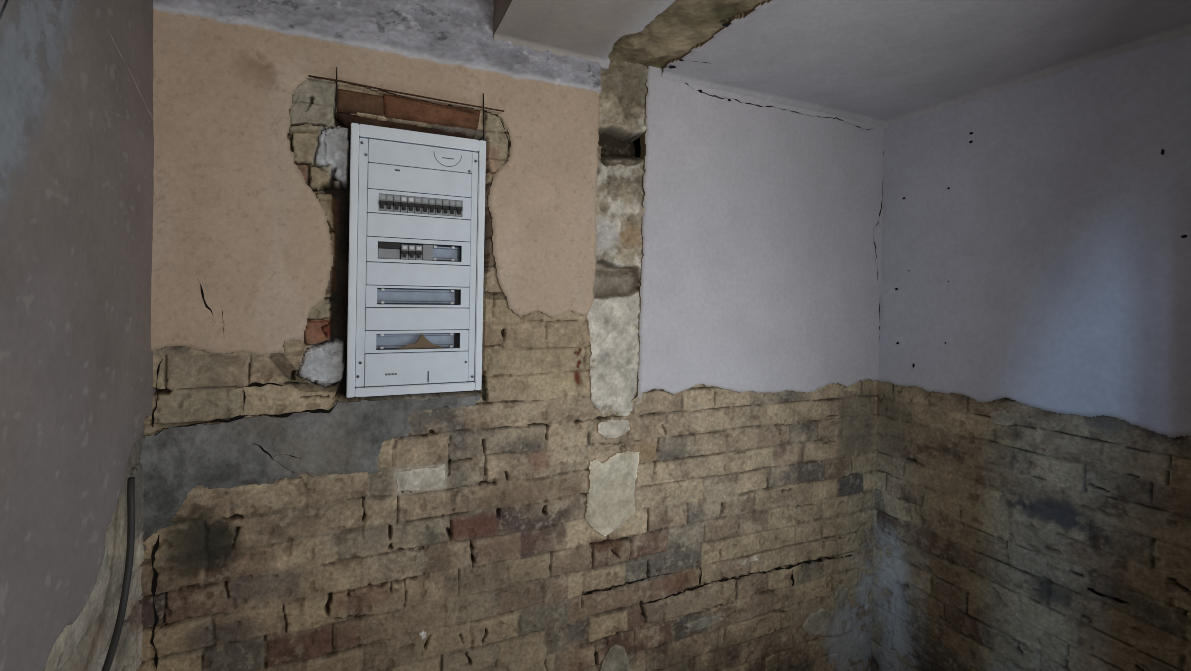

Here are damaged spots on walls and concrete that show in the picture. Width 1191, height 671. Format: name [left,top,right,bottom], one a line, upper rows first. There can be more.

crack [685,61,884,154]
crack [200,284,224,332]
flaking render [42,78,621,671]
crack [874,182,883,339]
crack [150,535,167,669]
crack [583,555,853,604]
flaking render [594,380,1191,671]
damp [1009,499,1080,529]